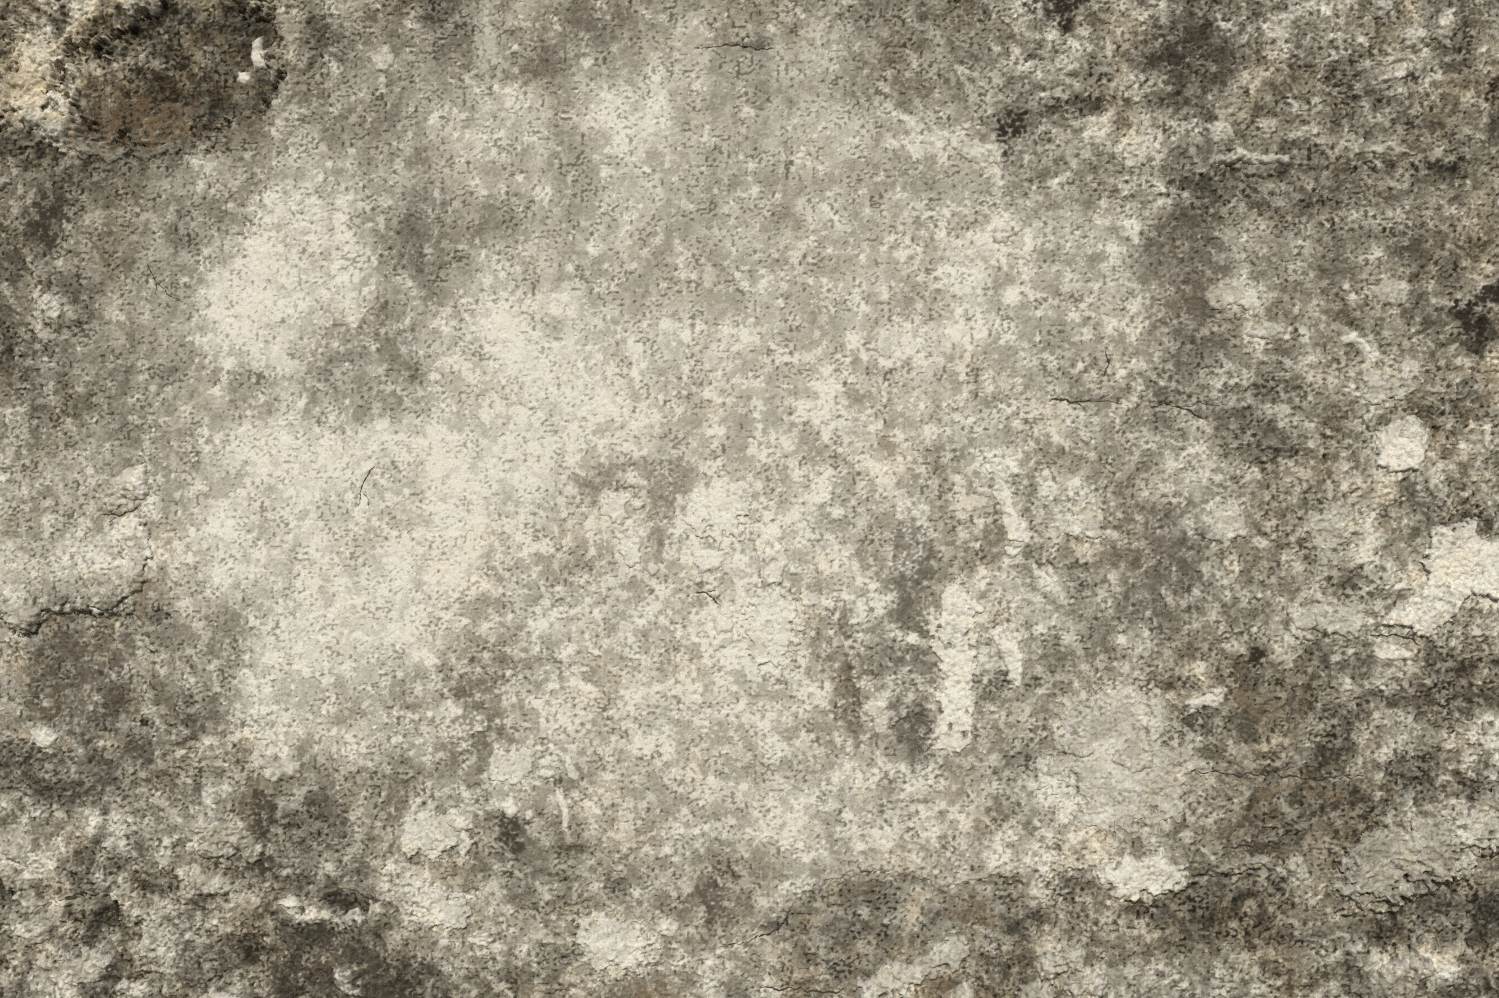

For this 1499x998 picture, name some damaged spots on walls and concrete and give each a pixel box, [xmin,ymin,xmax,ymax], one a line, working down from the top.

peeling [0,435,155,760]
peeling [0,837,30,915]
spalling [312,881,377,913]
peeling [399,806,494,947]
spalling [55,883,130,993]
peeling [199,984,243,998]
peeling [332,964,362,997]